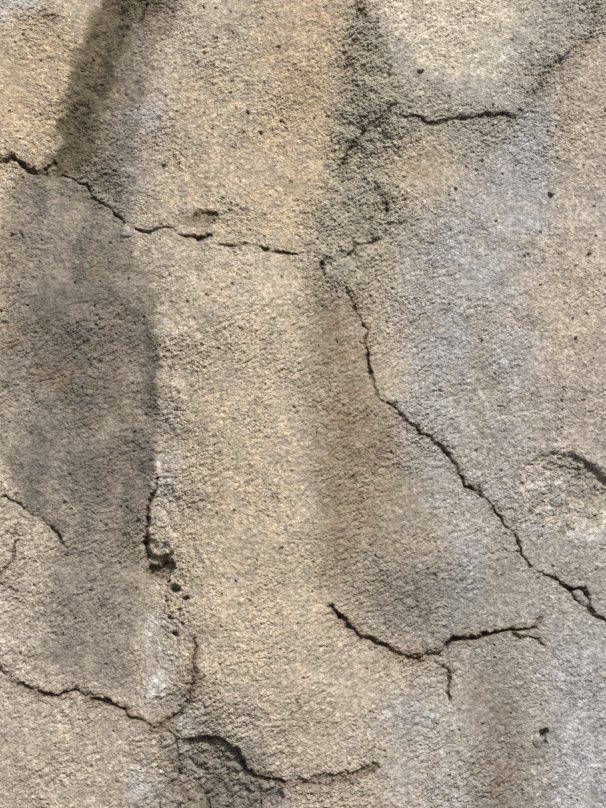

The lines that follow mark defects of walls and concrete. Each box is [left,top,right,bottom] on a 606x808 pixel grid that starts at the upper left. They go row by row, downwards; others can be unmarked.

crack [331,0,601,179]
damp [0,0,192,717]
crack [0,149,606,628]
spalling [513,448,606,546]
crack [0,633,204,735]
crack [323,597,554,708]
damp [120,760,172,808]
spalling [144,733,286,808]